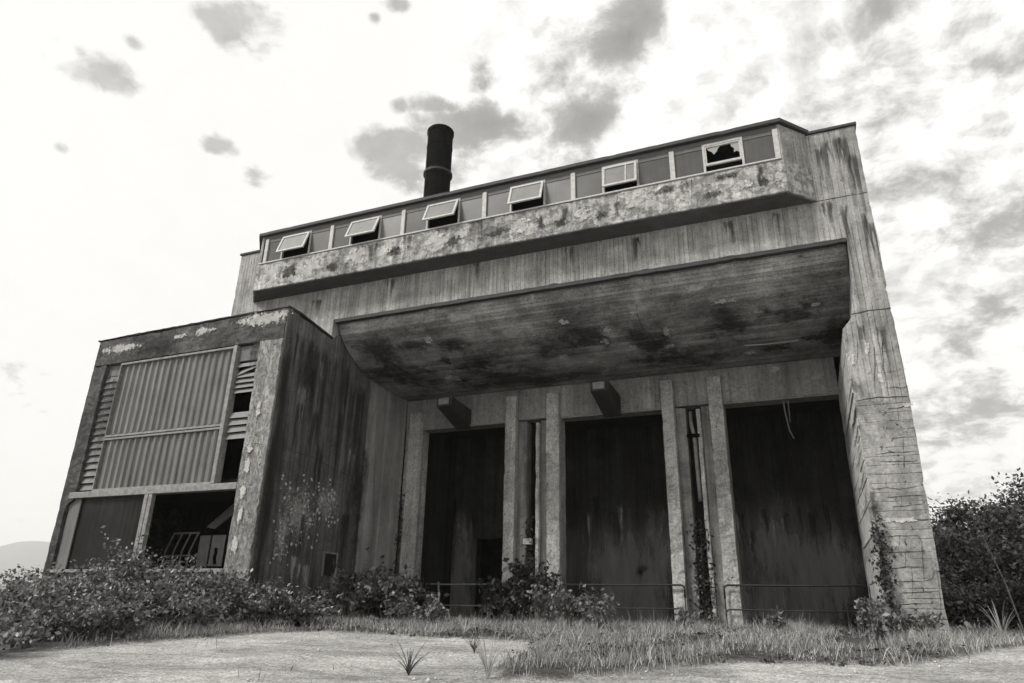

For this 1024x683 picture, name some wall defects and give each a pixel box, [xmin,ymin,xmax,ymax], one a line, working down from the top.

damp [816,138,860,186]
damp [821,202,850,234]
damp [863,216,878,245]
peeling [103,343,141,355]
peeling [174,327,217,339]
peeling [238,310,293,327]
damp [364,335,440,385]
damp [439,340,575,389]
damp [627,330,726,366]
spalling [230,441,253,555]
damp [253,337,367,590]
crack [857,342,941,611]